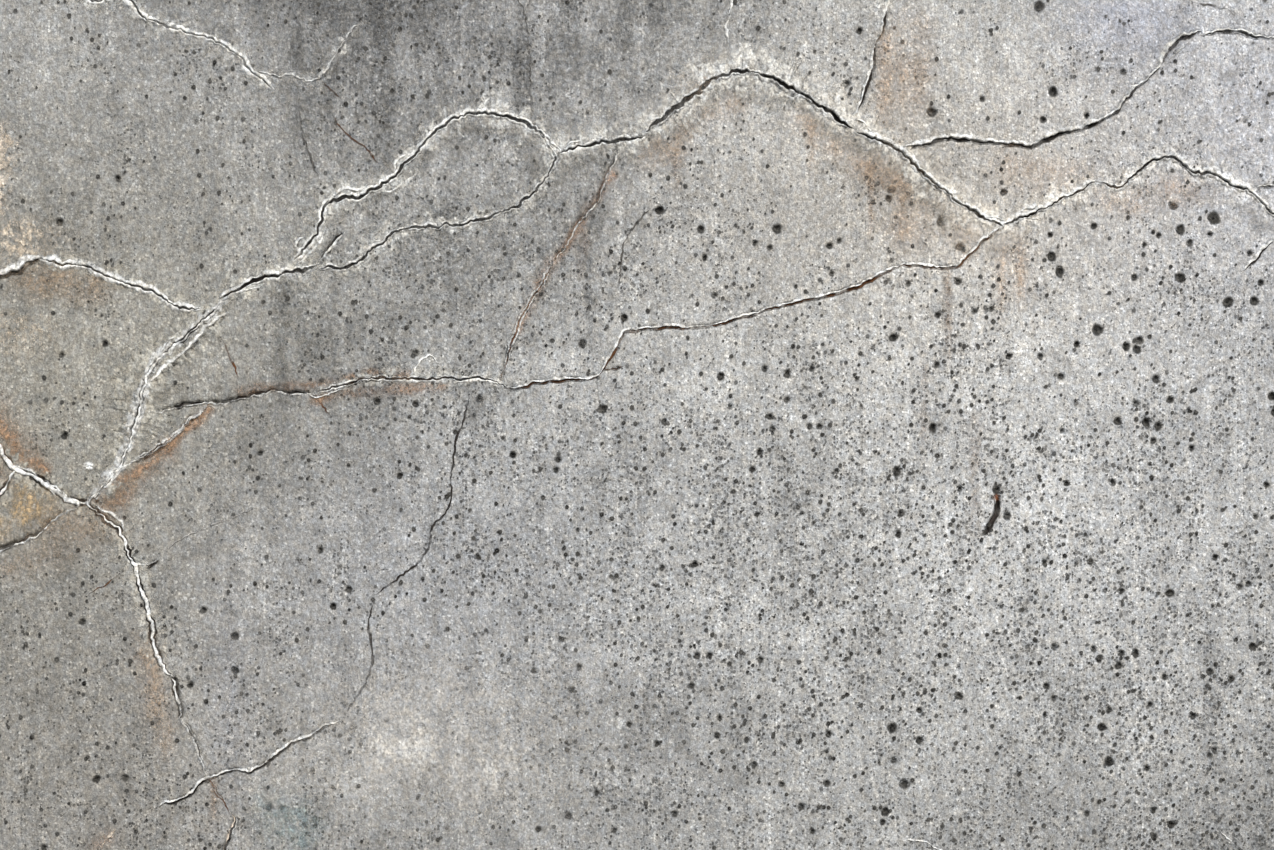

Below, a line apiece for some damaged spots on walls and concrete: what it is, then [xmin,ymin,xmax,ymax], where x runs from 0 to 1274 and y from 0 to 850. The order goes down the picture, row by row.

crack [77,0,363,98]
crack [518,0,532,83]
crack [873,0,894,40]
crack [1202,28,1274,39]
crack [696,30,1274,328]
corrosion [109,407,212,504]
crack [0,43,876,812]
crack [223,816,237,850]